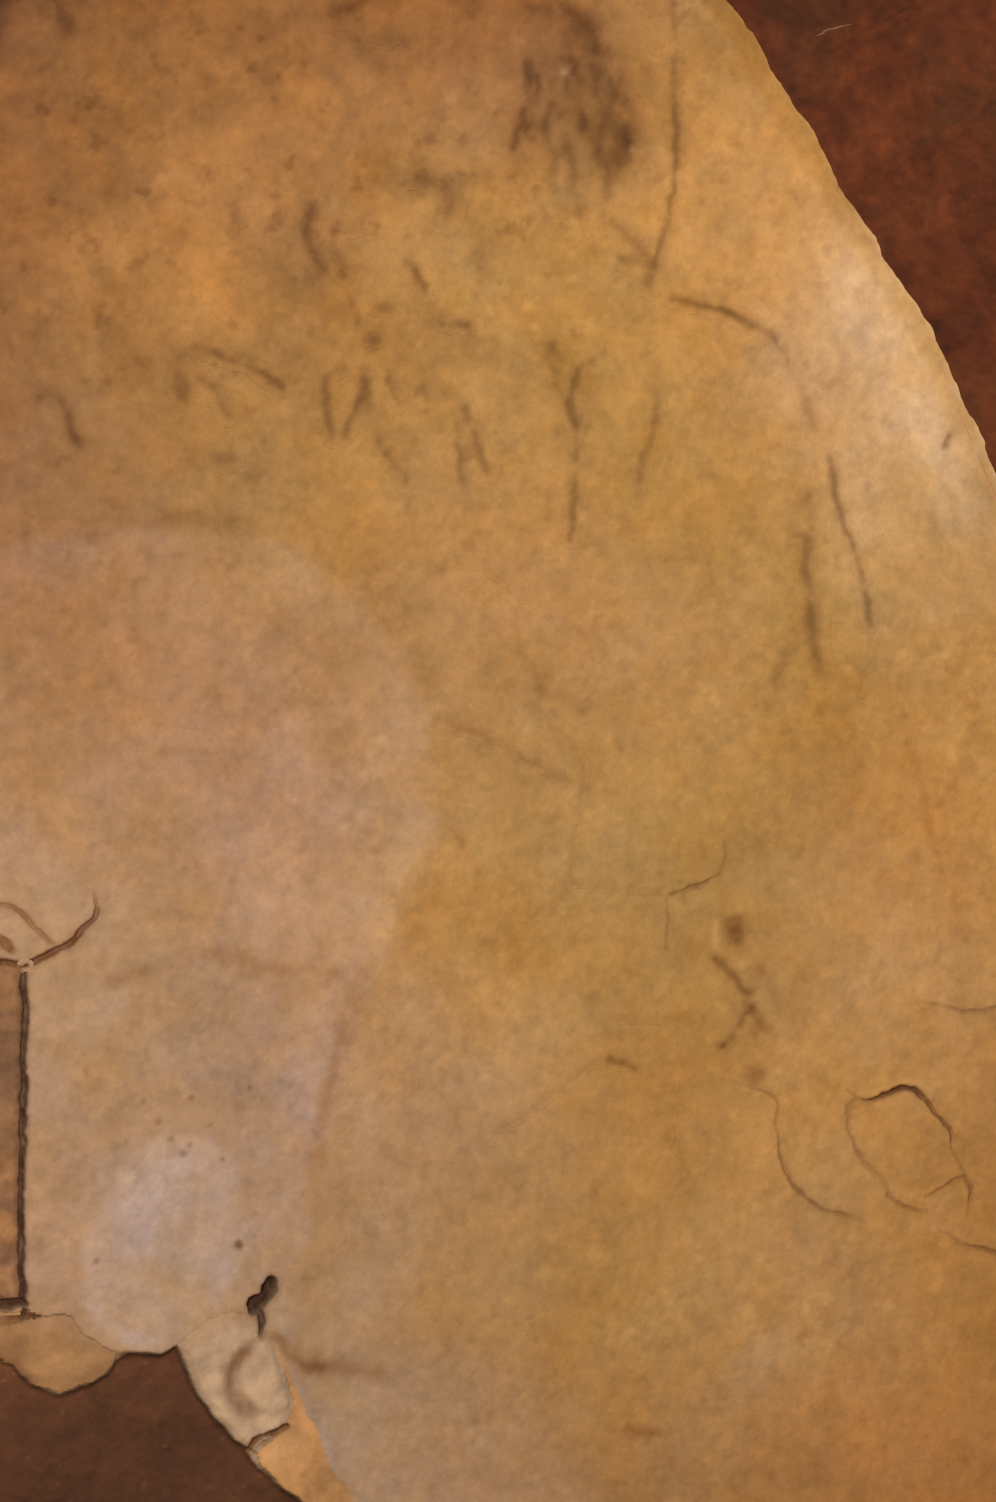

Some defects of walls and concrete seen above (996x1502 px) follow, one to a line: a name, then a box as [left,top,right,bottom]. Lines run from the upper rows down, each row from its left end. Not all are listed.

crack [919,996,996,1018]
spalling [230,1236,247,1254]
crack [730,1076,996,1261]
spalling [0,1270,360,1502]